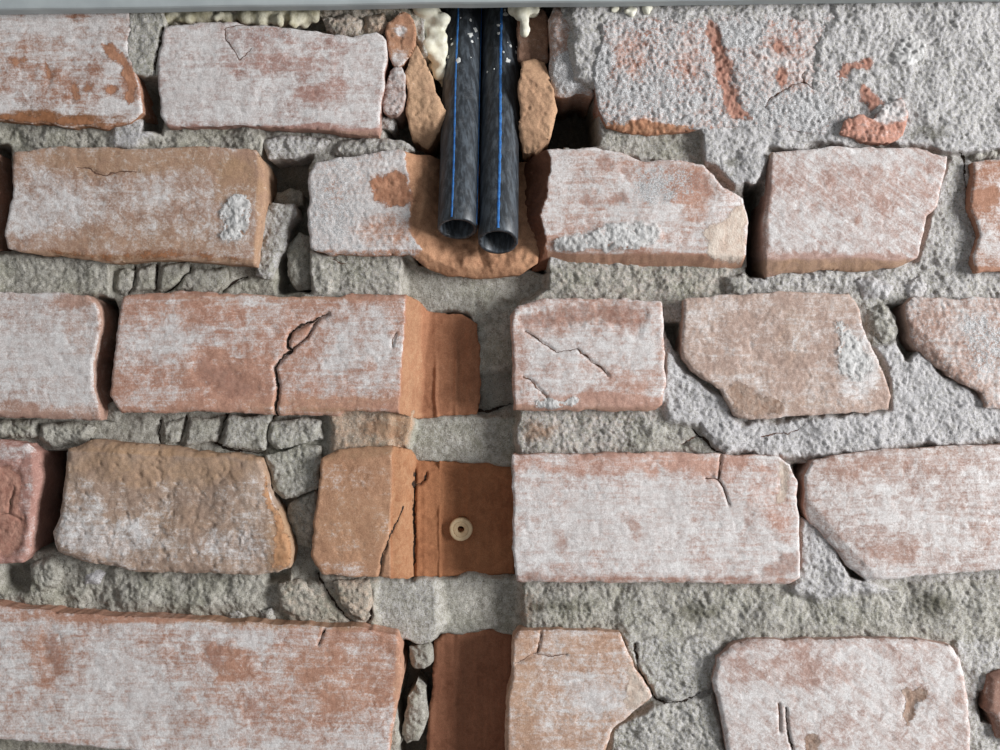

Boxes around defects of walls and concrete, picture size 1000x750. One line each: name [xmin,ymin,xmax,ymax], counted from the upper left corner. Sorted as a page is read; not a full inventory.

spalling [773,39,786,54]
spalling [705,20,753,120]
spalling [776,67,789,89]
crack [765,72,811,108]
spalling [837,57,874,80]
spalling [860,84,885,111]
crack [272,314,327,421]
crack [525,331,607,374]
crack [214,413,261,454]
crack [681,428,730,504]
crack [380,472,427,574]
crack [778,703,793,749]